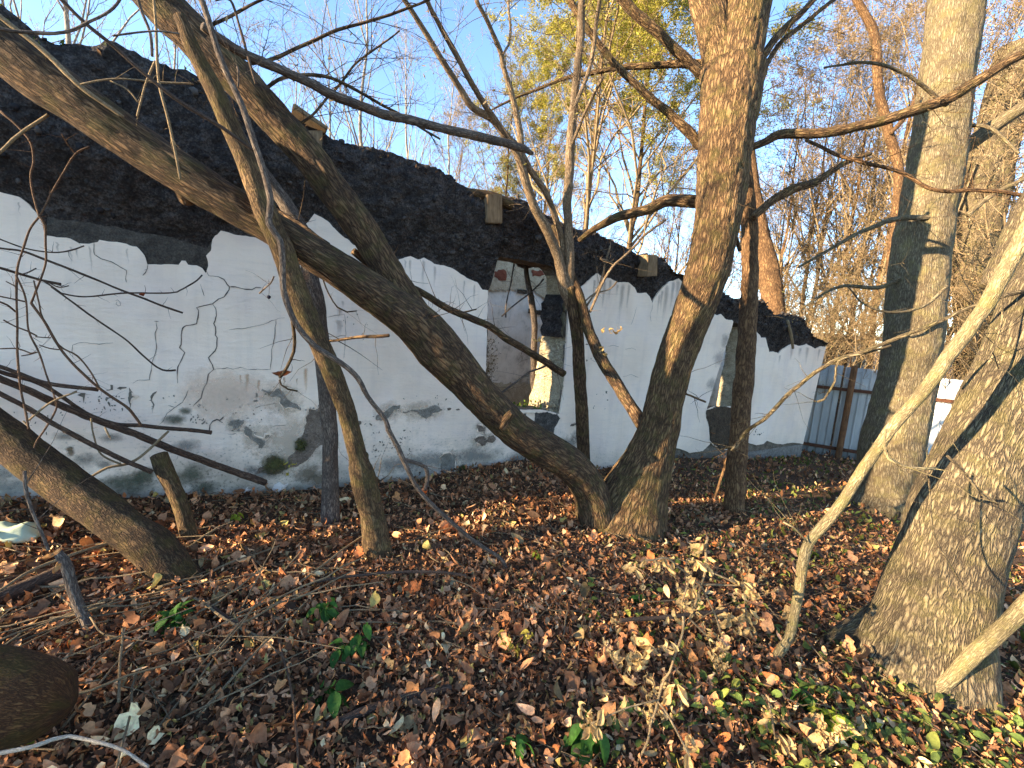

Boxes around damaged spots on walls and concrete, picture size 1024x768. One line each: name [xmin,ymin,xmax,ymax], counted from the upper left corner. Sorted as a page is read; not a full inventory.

flaking render [46,217,212,273]
flaking render [494,269,507,281]
crack [137,271,279,434]
damp [166,409,190,423]
damp [103,471,153,492]
damp [179,466,211,493]